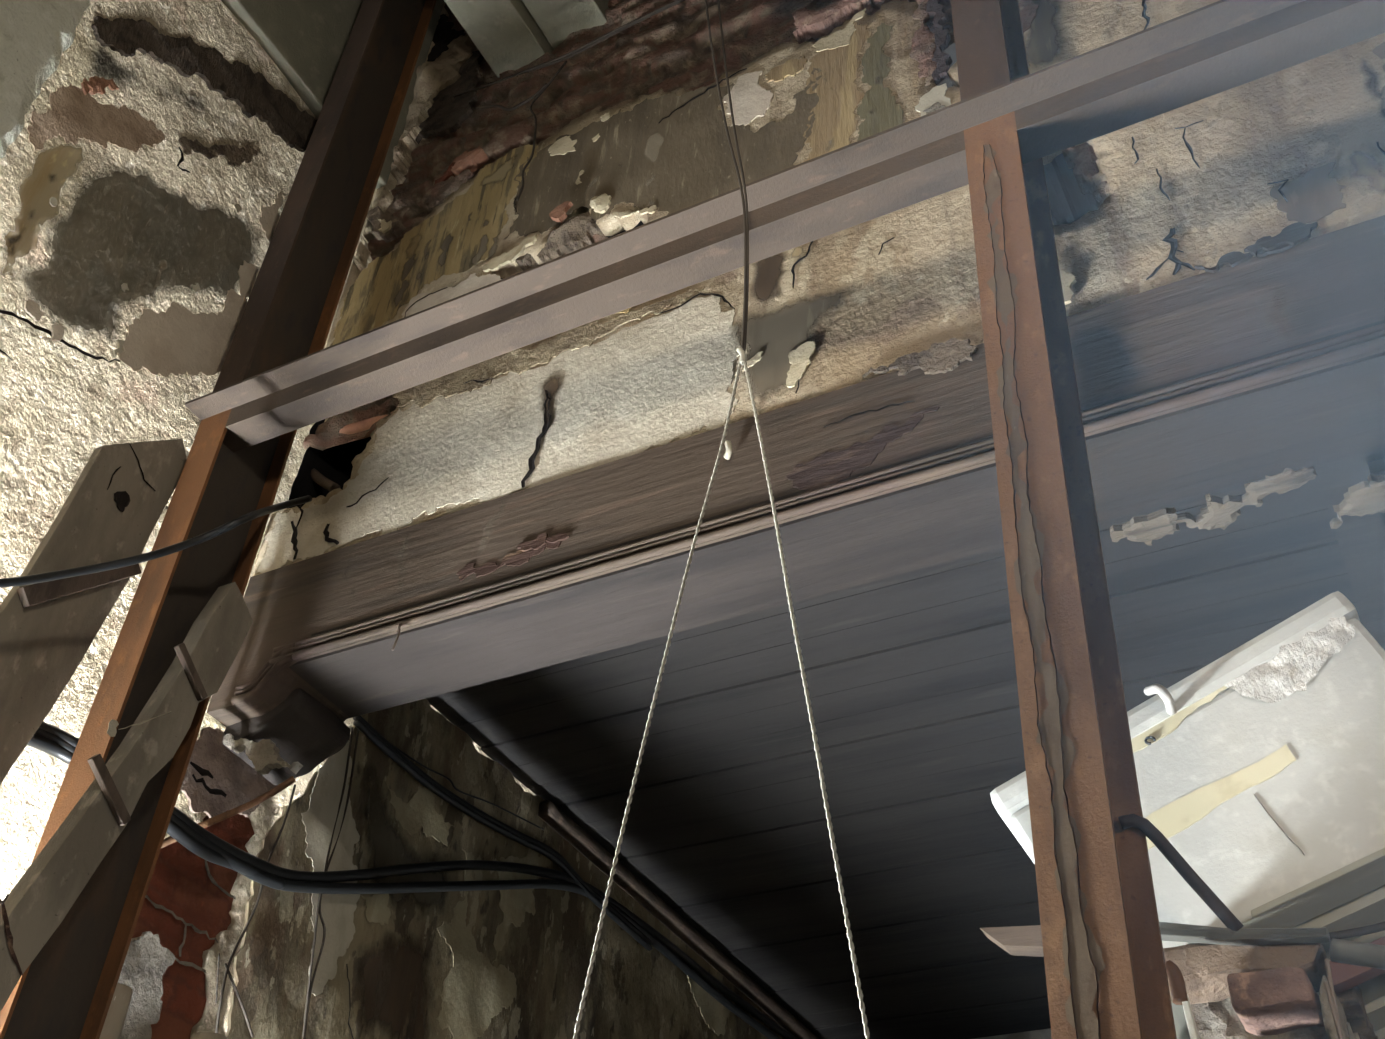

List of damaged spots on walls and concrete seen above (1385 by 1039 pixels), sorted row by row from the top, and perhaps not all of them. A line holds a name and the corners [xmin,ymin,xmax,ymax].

leakage [0,144,259,341]
spalling [482,194,657,279]
spalling [368,0,955,261]
crack [1132,137,1195,280]
crack [1175,120,1204,168]
crack [0,301,120,363]
crack [521,390,551,488]
corrosion [983,144,1101,1039]
flaking render [203,810,255,853]
leakage [364,768,447,912]
flaking render [132,841,238,1039]
leakage [358,935,429,1039]